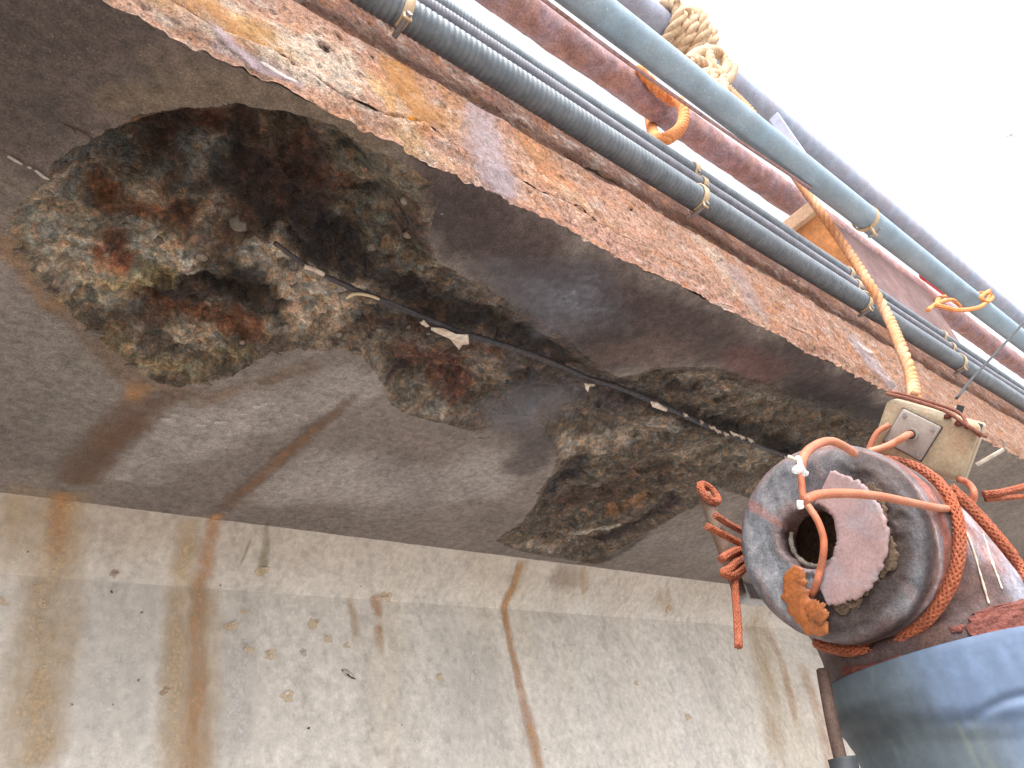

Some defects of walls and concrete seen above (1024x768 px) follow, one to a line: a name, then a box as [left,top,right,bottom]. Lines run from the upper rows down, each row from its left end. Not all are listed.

spalling [10,102,879,561]
rust [502,566,541,766]